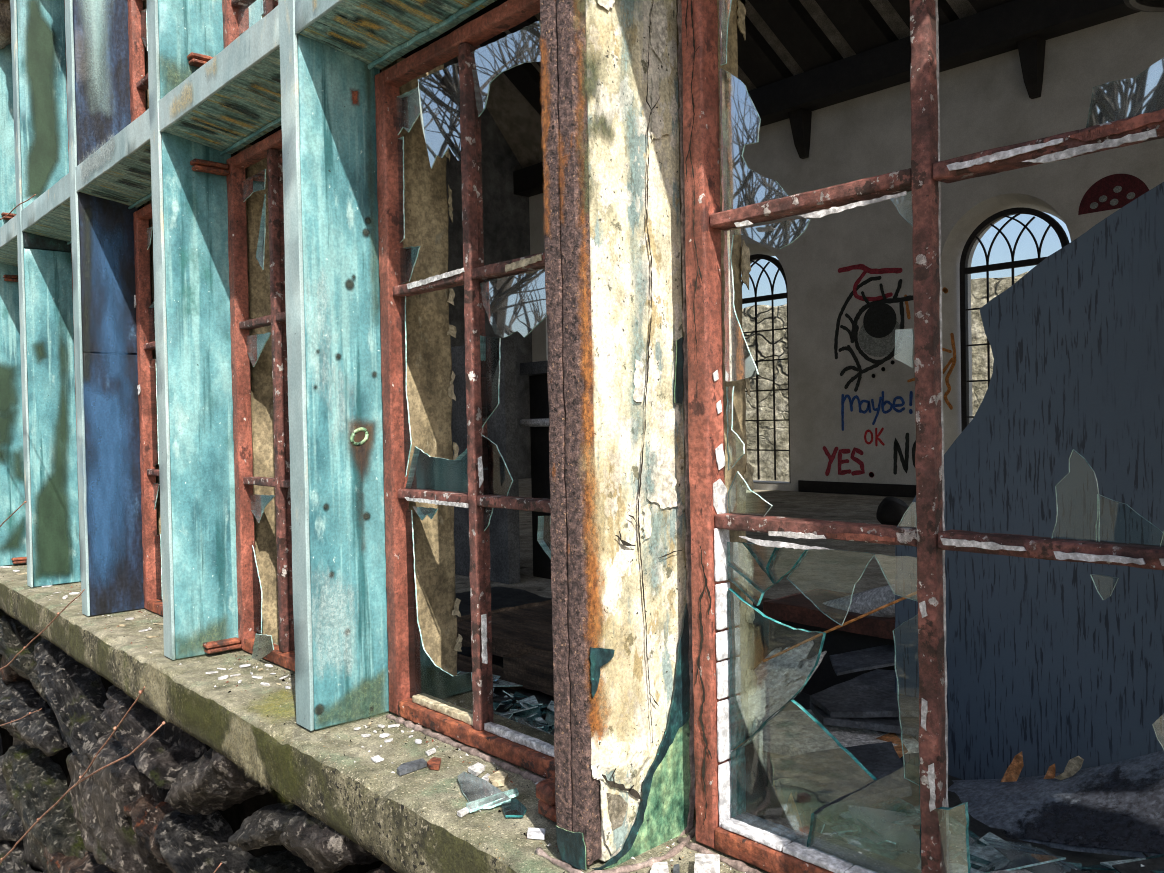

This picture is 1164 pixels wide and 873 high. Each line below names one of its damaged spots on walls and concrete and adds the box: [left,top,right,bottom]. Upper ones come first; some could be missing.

rust [541,39,564,233]
flaking render [597,0,615,11]
flaking render [649,0,671,139]
rust [579,200,604,648]
crack [615,0,712,825]
damp [315,673,384,724]
rust [589,673,611,741]
spalling [600,781,639,854]